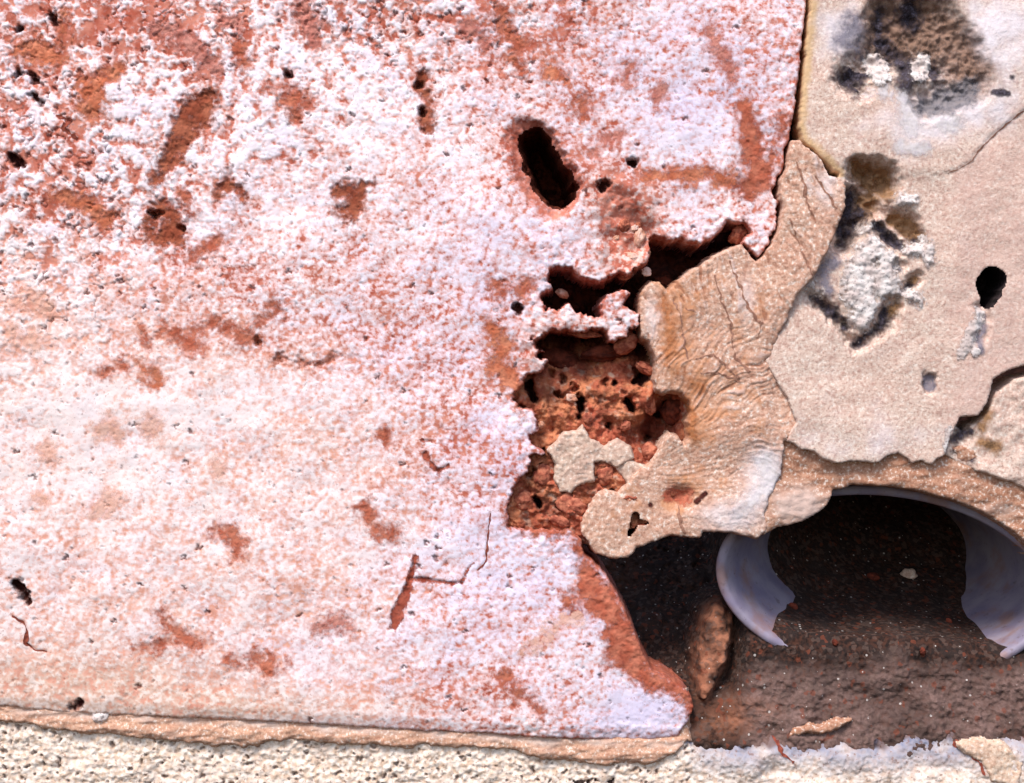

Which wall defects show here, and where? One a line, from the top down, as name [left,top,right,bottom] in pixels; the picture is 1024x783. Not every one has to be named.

water stain [833,0,1014,155]
spalling [541,189,564,208]
spalling [486,218,748,317]
crack [673,260,763,383]
crack [788,119,837,276]
water stain [805,158,936,349]
spalling [482,314,693,719]
efflorescence [733,452,781,518]
peeling [789,716,852,736]